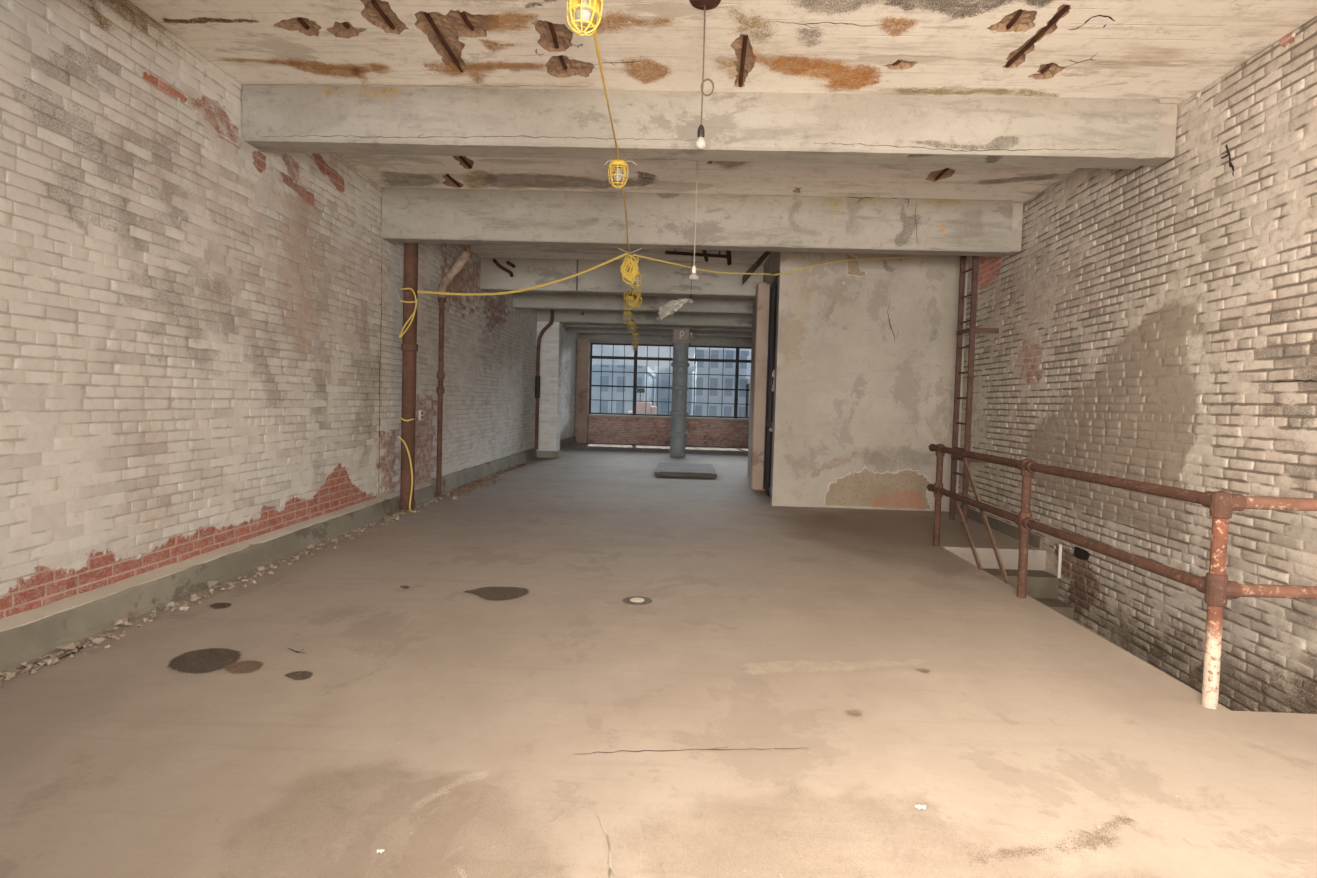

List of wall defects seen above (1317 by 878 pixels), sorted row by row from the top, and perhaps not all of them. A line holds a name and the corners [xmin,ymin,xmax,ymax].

rust [220,57,404,101]
spalling [273,0,499,73]
spalling [532,20,595,78]
spalling [730,34,756,87]
rust [713,6,1058,97]
damp [788,0,1054,48]
spalling [987,4,1075,80]
peeling [142,69,345,206]
damp [1025,298,1222,575]
peeling [0,395,438,619]
peeling [808,451,931,508]